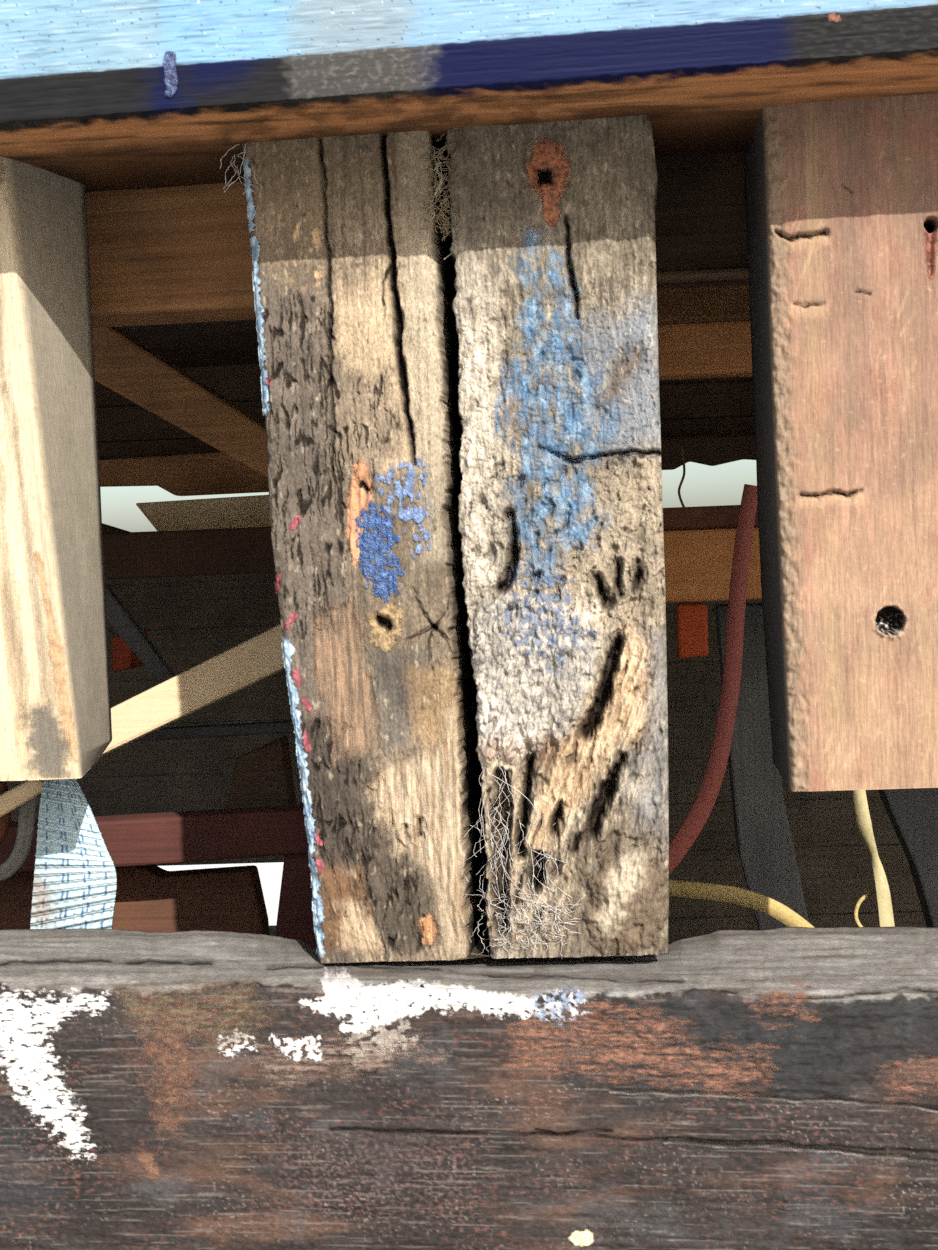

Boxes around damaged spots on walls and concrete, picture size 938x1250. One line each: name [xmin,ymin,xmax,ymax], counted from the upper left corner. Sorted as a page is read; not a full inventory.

rust [526,139,571,226]
crack [776,232,826,241]
rust [925,229,938,278]
crack [265,135,415,630]
crack [540,447,661,464]
crack [801,490,856,498]
crack [411,140,490,953]
crack [315,788,439,970]
crack [609,1089,728,1098]
crack [787,1098,938,1113]
crack [330,1126,477,1134]
crack [523,1129,938,1160]